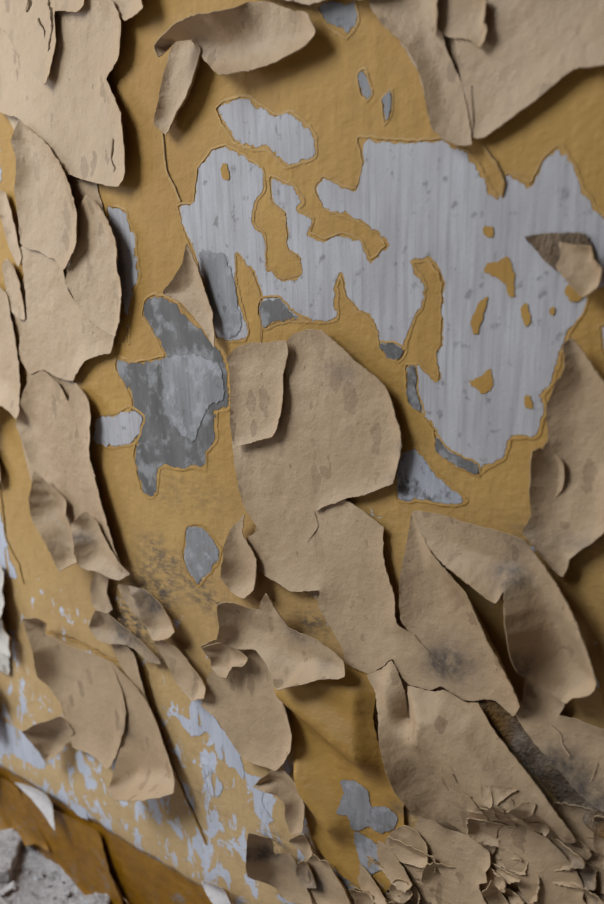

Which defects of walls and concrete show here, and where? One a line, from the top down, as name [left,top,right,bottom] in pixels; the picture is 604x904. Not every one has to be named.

peeling [0,0,144,563]
flaking render [90,0,604,824]
peeling [0,516,17,676]
flaking render [0,718,53,769]
peeling [0,777,131,904]
peeling [22,618,157,769]
peeling [289,724,604,904]